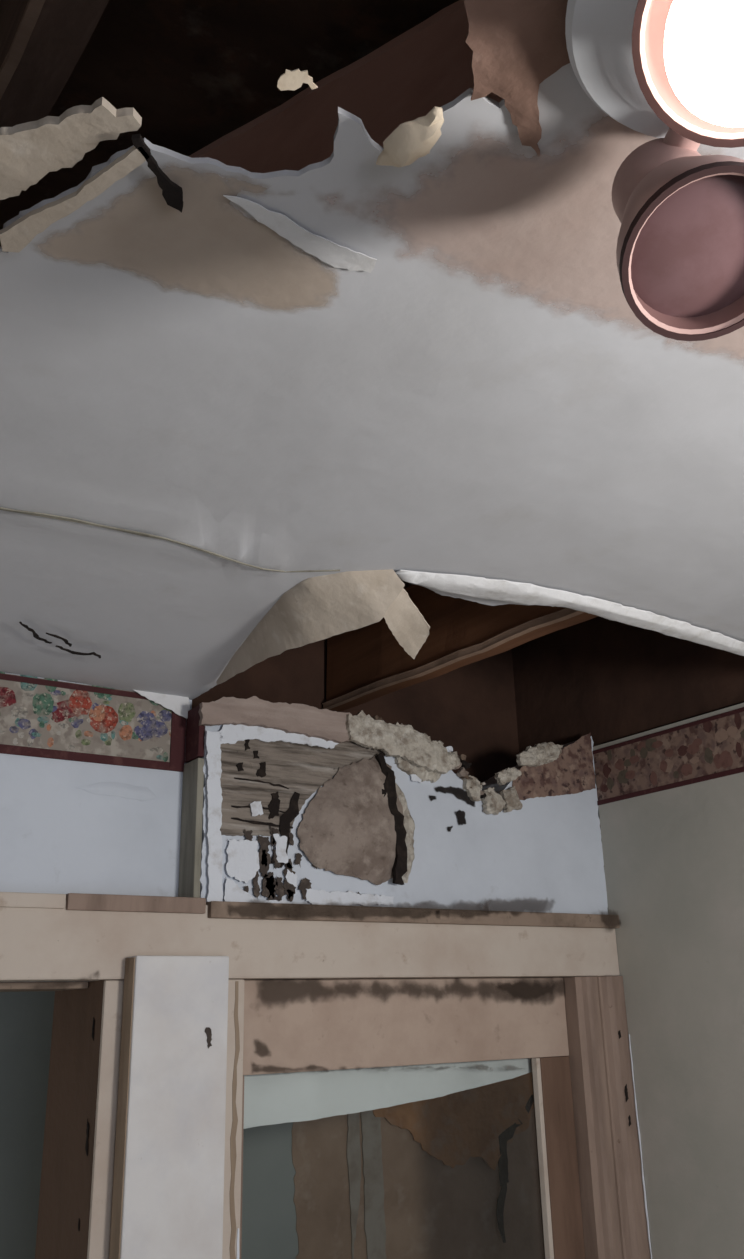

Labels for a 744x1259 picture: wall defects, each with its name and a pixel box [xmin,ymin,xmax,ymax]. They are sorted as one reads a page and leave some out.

peeling [39,167,336,310]
crack [0,507,340,573]
peeling [206,730,394,906]
flaking render [345,710,563,815]
peeling [229,981,240,1259]
flaking render [292,1072,544,1259]